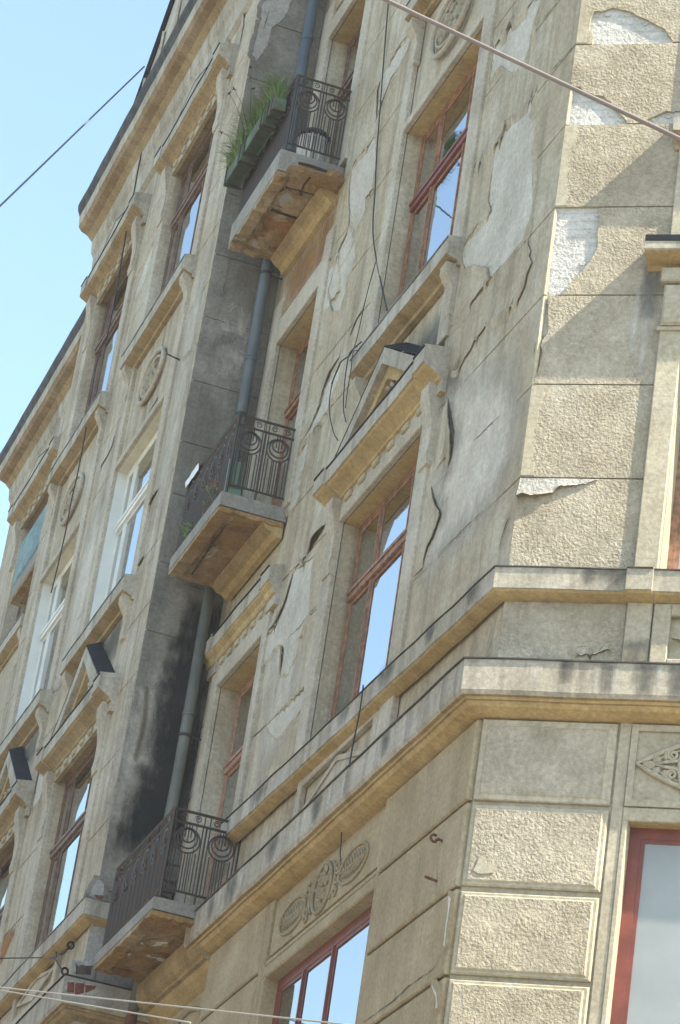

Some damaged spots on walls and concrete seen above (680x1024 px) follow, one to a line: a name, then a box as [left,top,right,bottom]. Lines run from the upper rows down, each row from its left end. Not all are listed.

peeling [247,0,261,59]
peeling [271,133,378,318]
crack [450,82,537,380]
peeling [462,91,538,286]
water stain [117,602,221,851]